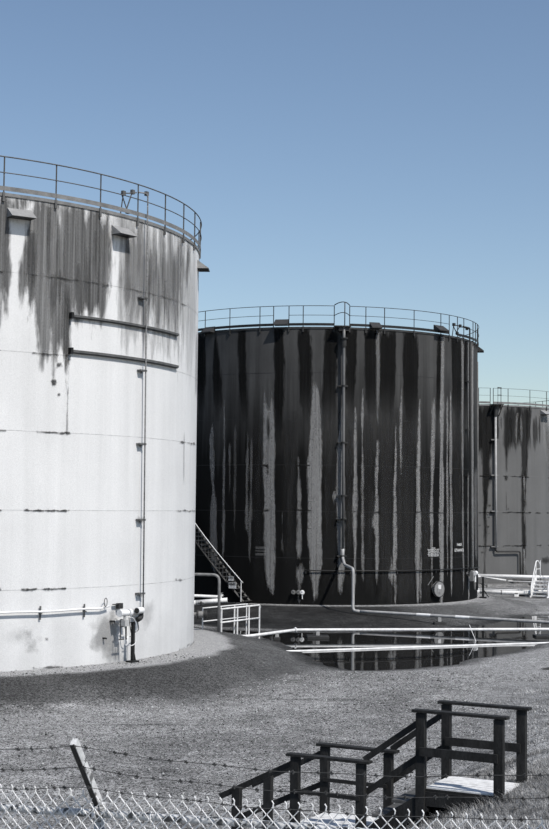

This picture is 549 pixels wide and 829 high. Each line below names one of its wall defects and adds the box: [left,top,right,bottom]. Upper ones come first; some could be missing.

leakage [0,196,111,368]
leakage [120,222,189,335]
leakage [198,334,222,400]
leakage [238,330,246,402]
leakage [274,329,285,425]
leakage [298,329,311,401]
leakage [322,329,419,404]
leakage [451,338,467,403]
leakage [478,406,540,575]